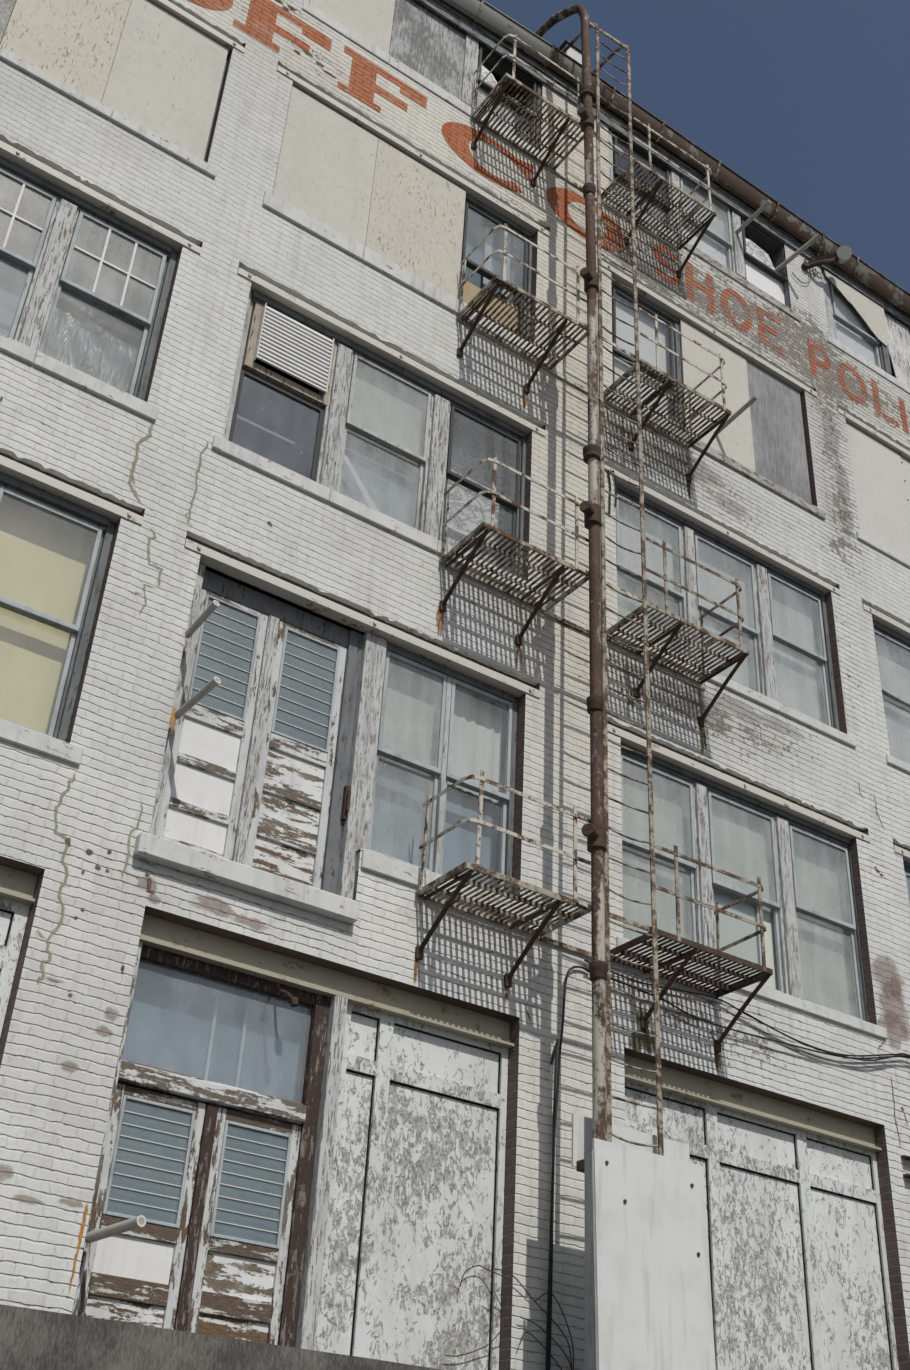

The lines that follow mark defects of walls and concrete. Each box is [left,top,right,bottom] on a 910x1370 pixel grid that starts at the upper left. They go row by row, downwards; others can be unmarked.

crack [128,424,163,613]
crack [185,443,208,524]
crack [37,774,75,983]